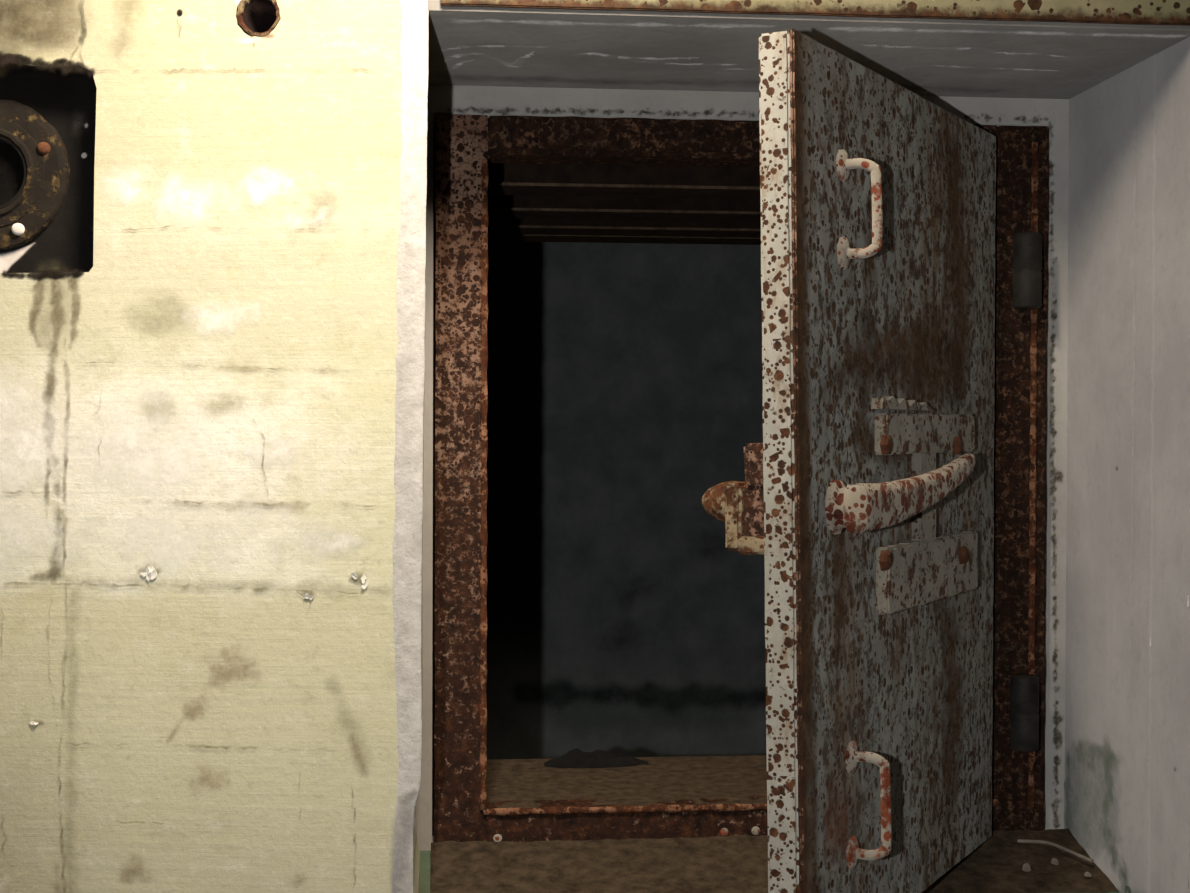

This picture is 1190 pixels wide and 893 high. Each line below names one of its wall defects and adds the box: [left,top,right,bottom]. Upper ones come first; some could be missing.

damp [31,283,60,330]
damp [46,374,54,402]
rust [854,381,912,463]
rust [795,246,815,734]